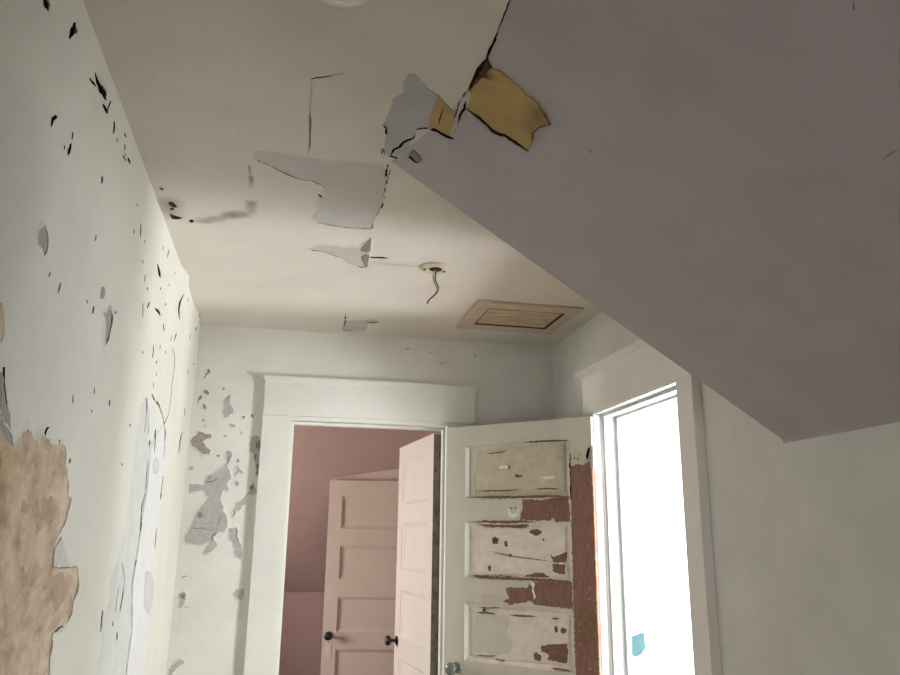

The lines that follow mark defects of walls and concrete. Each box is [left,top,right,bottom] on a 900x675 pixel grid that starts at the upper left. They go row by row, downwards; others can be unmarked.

crack [486,0,510,59]
crack [308,73,344,157]
peeling [34,220,49,259]
peeling [87,287,116,351]
peeling [179,366,261,561]
peeling [0,367,79,675]
peeling [97,345,166,675]